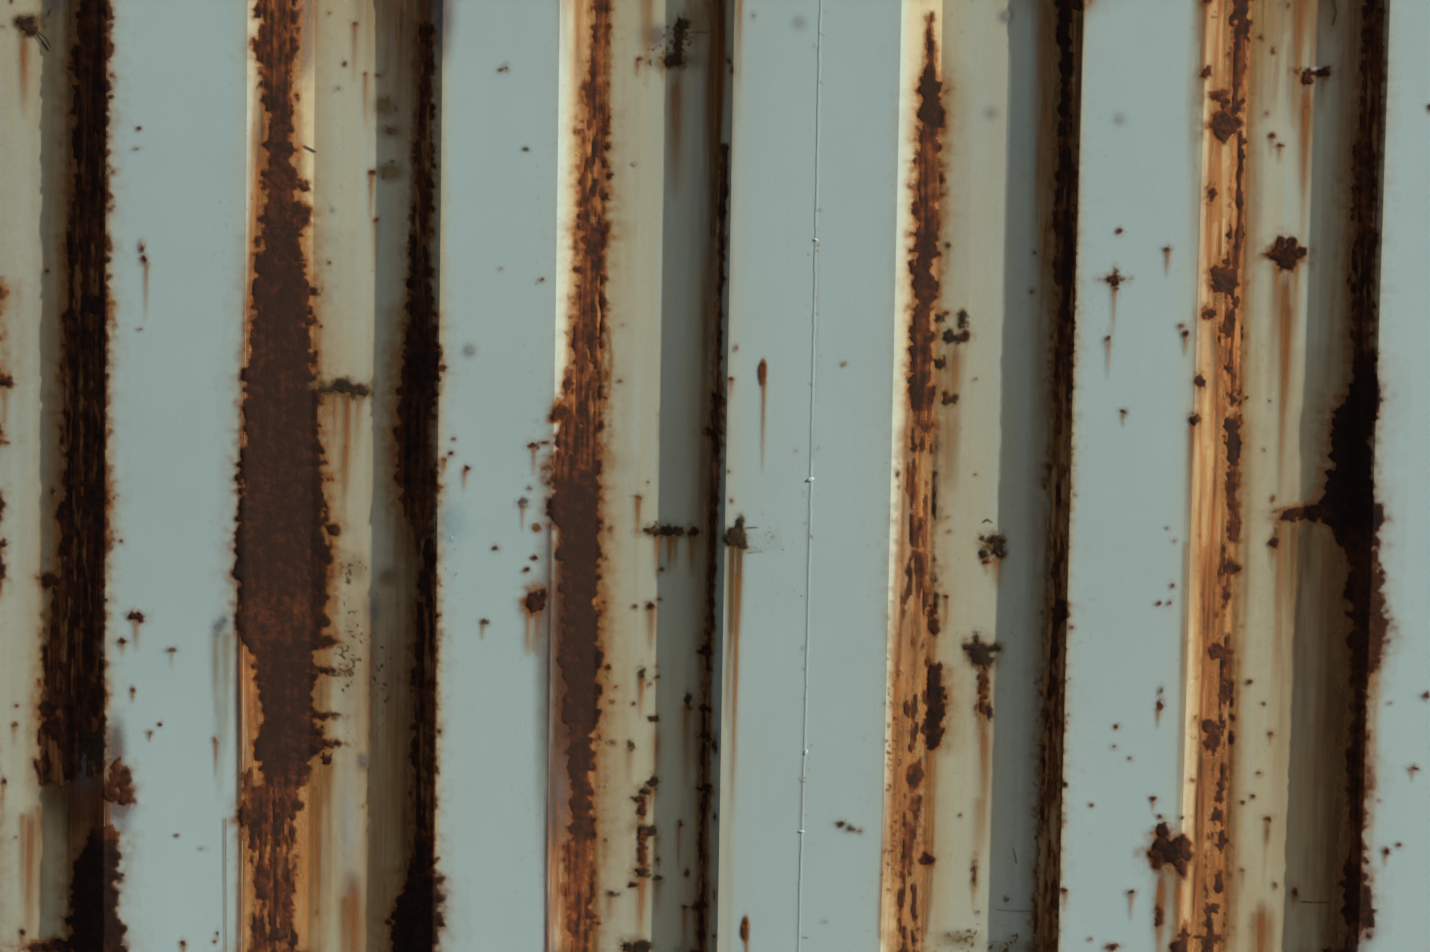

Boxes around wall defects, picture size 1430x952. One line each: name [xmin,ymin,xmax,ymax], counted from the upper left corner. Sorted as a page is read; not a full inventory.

rust [12,0,144,952]
rust [213,0,346,952]
rust [519,0,635,952]
rust [635,481,649,525]
rust [632,665,660,706]
rust [633,598,661,632]
rust [881,12,954,952]
rust [1028,0,1093,952]
rust [1181,0,1275,952]
rust [1269,0,1402,952]